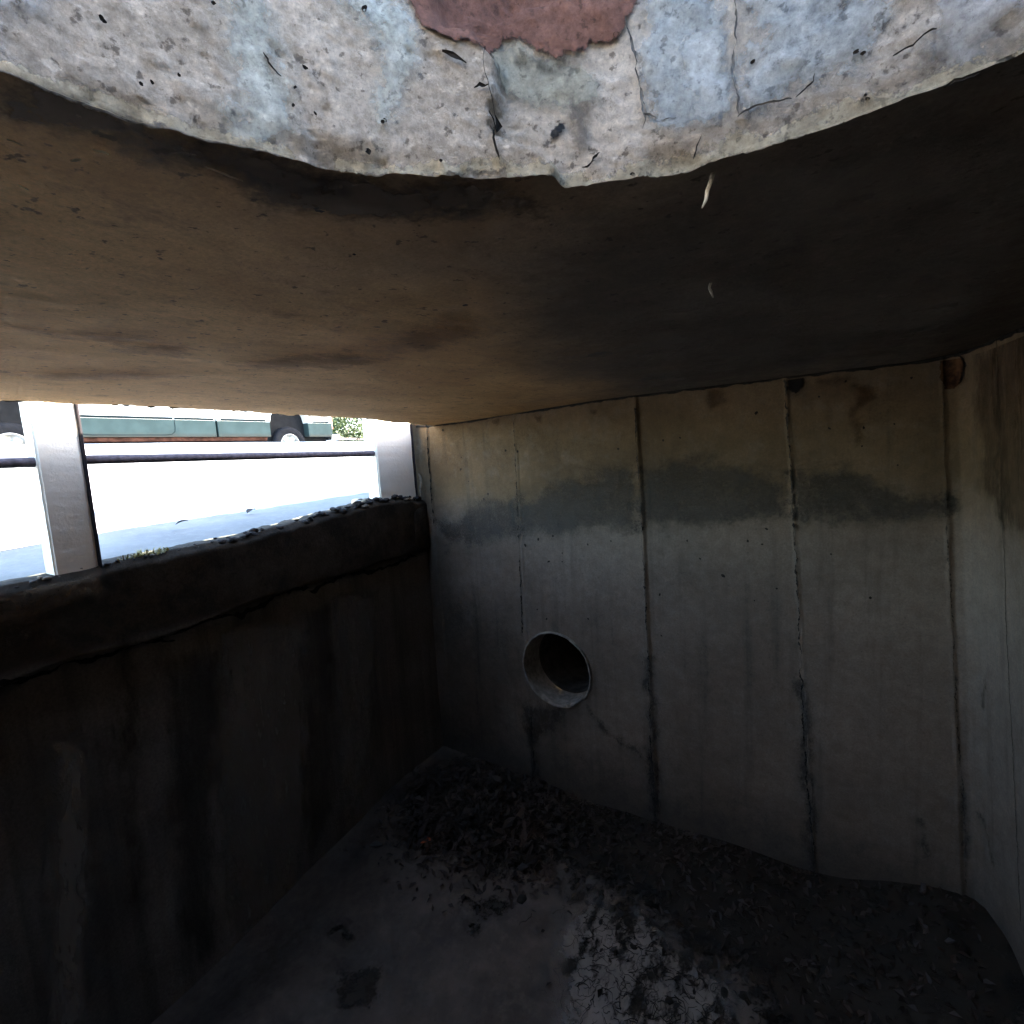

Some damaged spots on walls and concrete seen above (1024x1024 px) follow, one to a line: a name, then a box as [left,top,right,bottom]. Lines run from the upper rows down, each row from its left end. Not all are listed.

crack [442,46,502,160]
peeling [410,0,637,58]
crack [625,15,676,126]
crack [731,0,815,116]
crack [893,28,937,56]
damp [441,462,781,543]